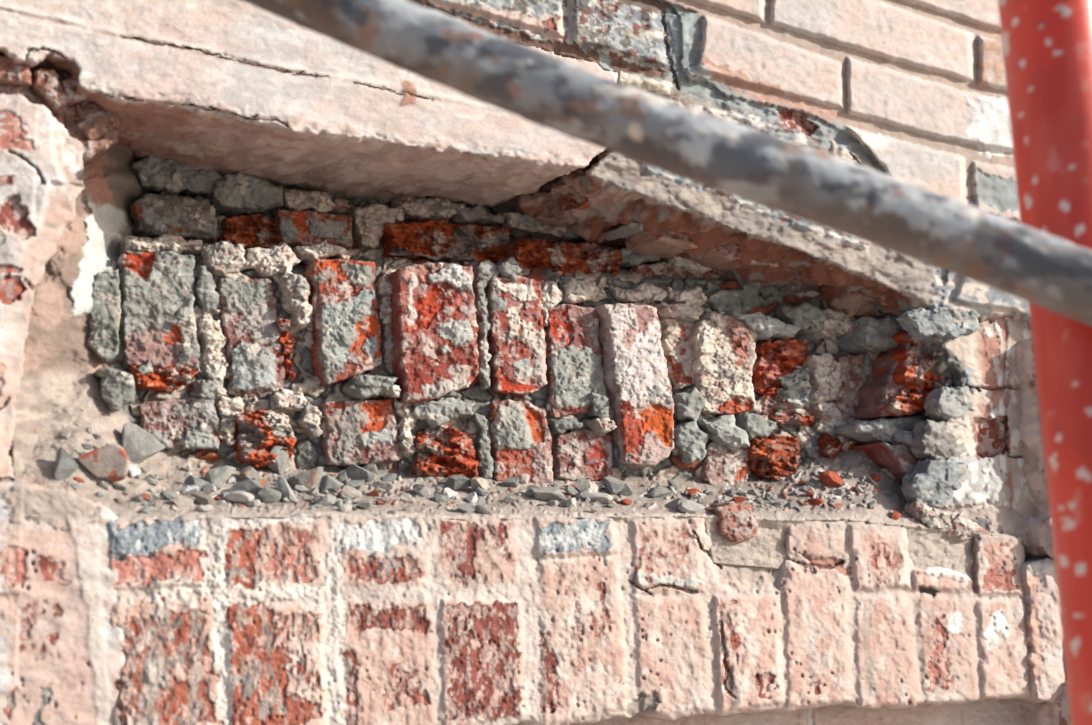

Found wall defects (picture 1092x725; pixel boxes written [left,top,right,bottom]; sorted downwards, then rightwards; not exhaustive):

crack [25,47,68,59]
spalling [0,55,1019,591]
peeling [19,600,63,660]
peeling [34,684,52,725]
peeling [115,601,325,725]
peeling [340,649,362,725]
peeling [350,603,432,635]
peeling [382,661,430,711]
peeling [442,600,523,721]
peeling [539,582,614,713]
peeling [718,600,780,699]
peeling [927,614,954,692]